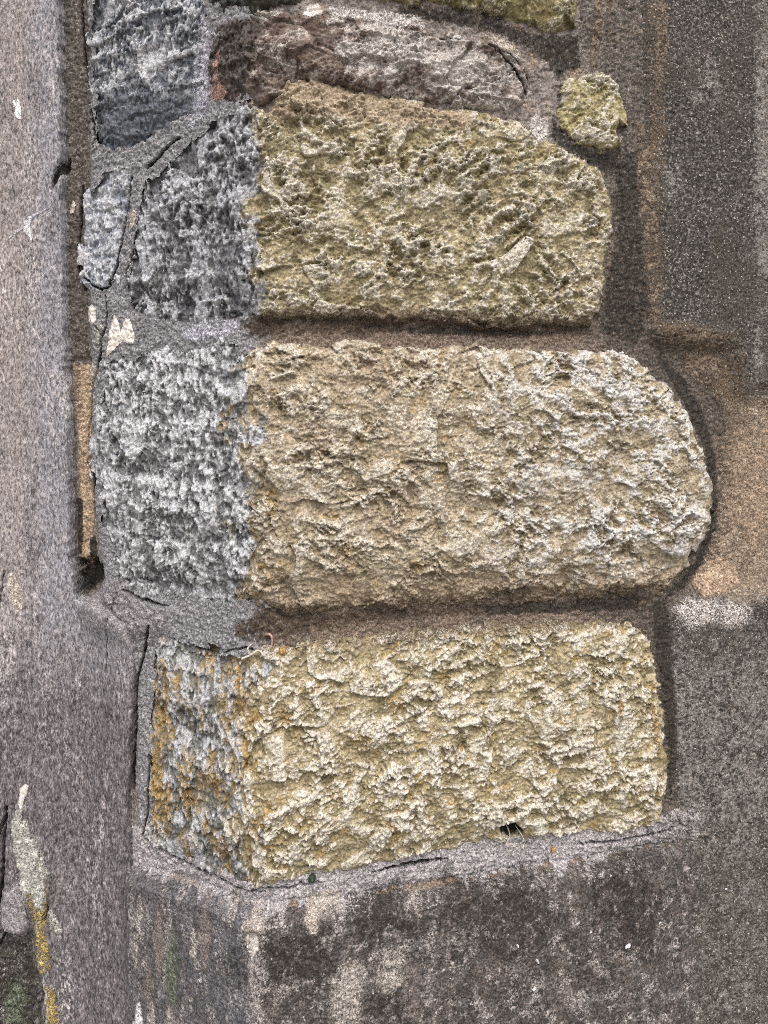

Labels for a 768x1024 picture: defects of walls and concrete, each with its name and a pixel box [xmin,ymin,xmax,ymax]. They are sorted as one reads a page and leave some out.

crack [488,44,528,95]
crack [78,138,180,369]
crack [132,630,301,893]
crack [372,857,441,873]